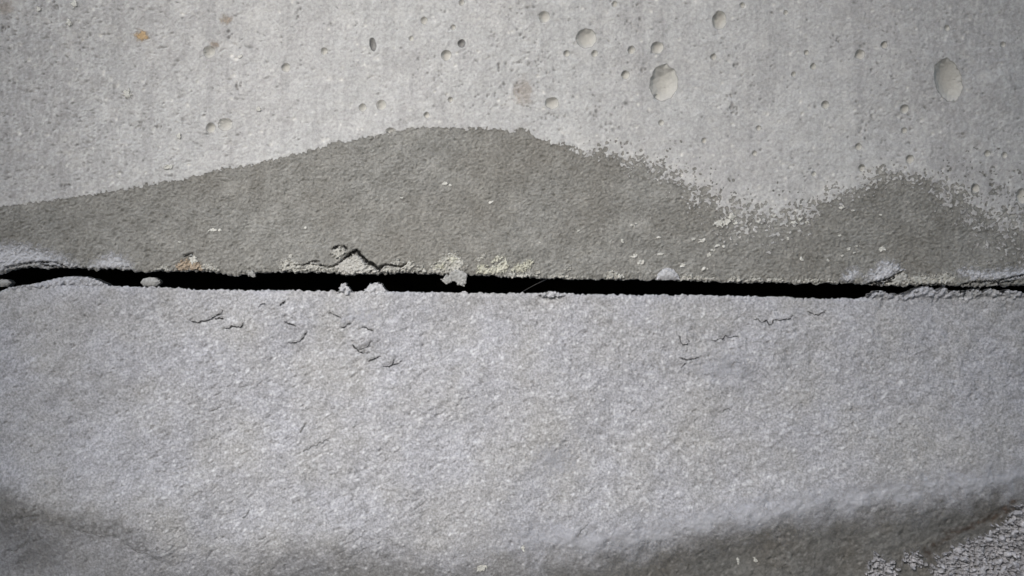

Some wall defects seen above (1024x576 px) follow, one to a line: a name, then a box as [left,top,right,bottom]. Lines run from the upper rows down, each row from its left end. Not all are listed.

damp [0,126,1024,304]
crack [7,261,66,269]
spalling [279,245,430,276]
crack [868,272,901,285]
crack [961,275,1023,287]